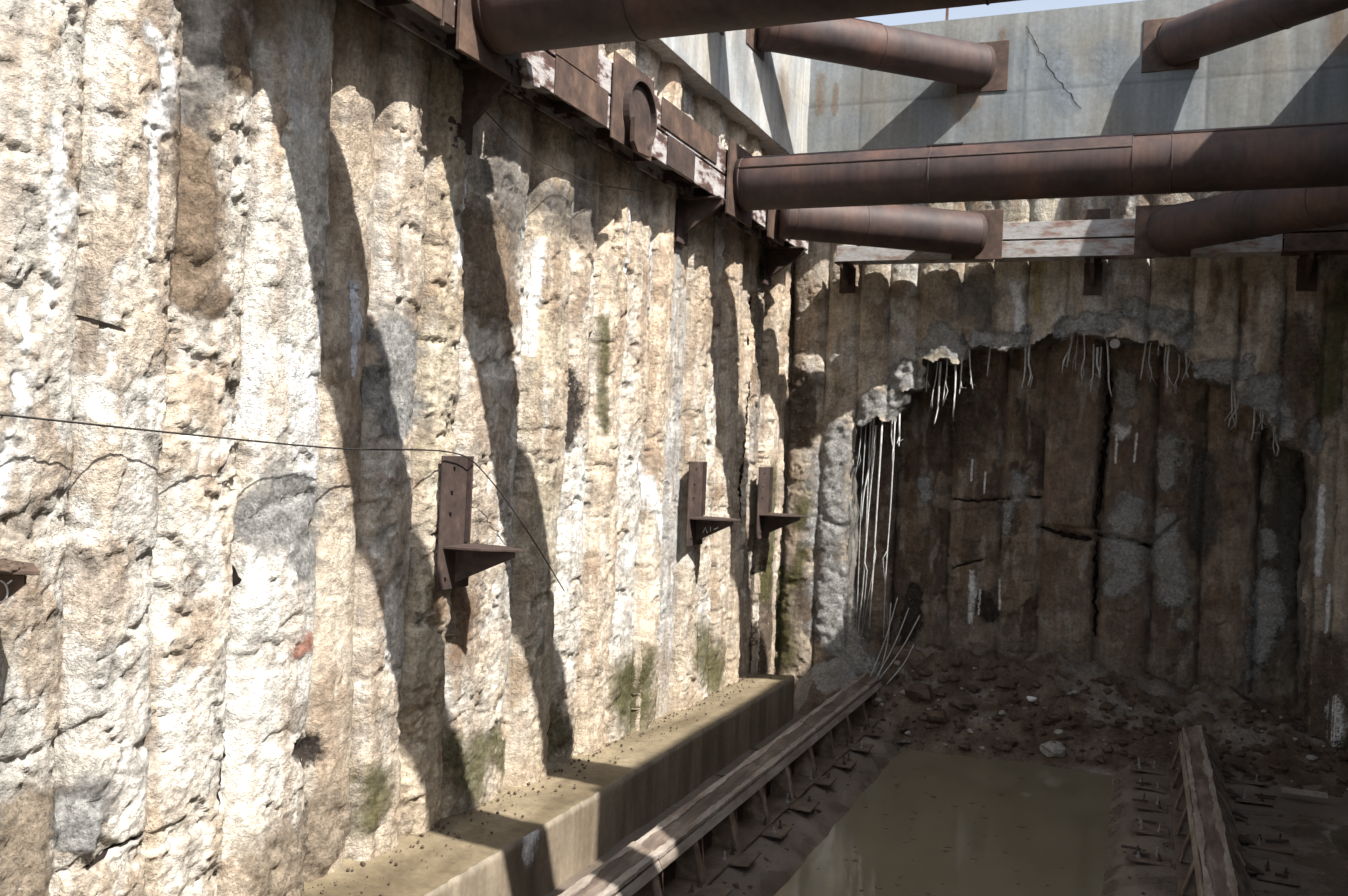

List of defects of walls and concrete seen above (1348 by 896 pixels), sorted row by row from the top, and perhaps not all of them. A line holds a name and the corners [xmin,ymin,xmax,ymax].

spalling [1053,309,1297,456]
spalling [790,322,1033,708]
crack [952,373,1151,636]
spalling [1099,431,1196,631]
spalling [1244,527,1288,683]
crack [86,832,143,870]